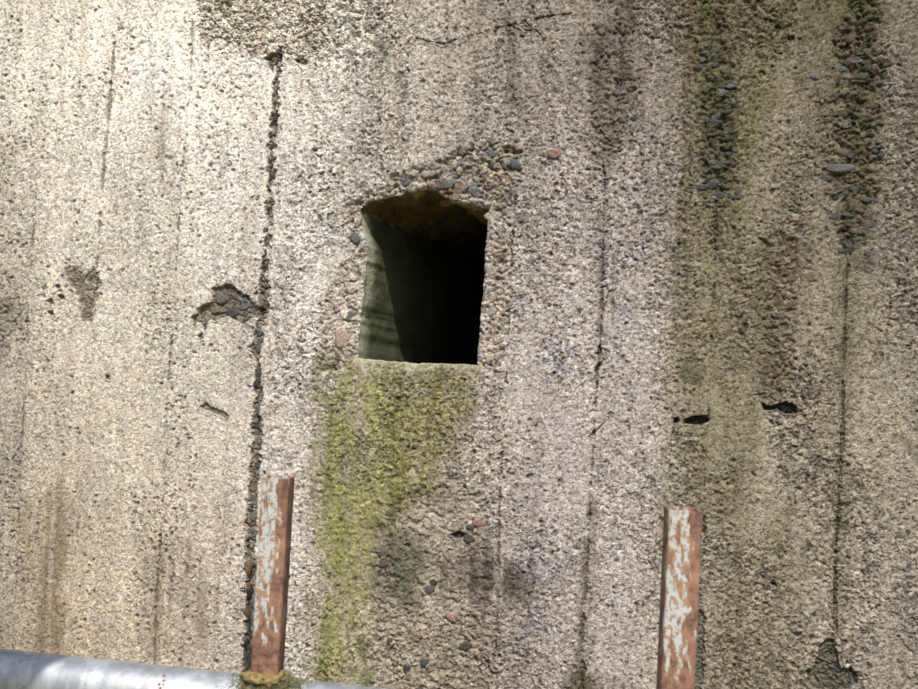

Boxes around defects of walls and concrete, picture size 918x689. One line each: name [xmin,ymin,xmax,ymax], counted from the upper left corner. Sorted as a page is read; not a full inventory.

crack [414,11,574,47]
spalling [190,282,265,388]